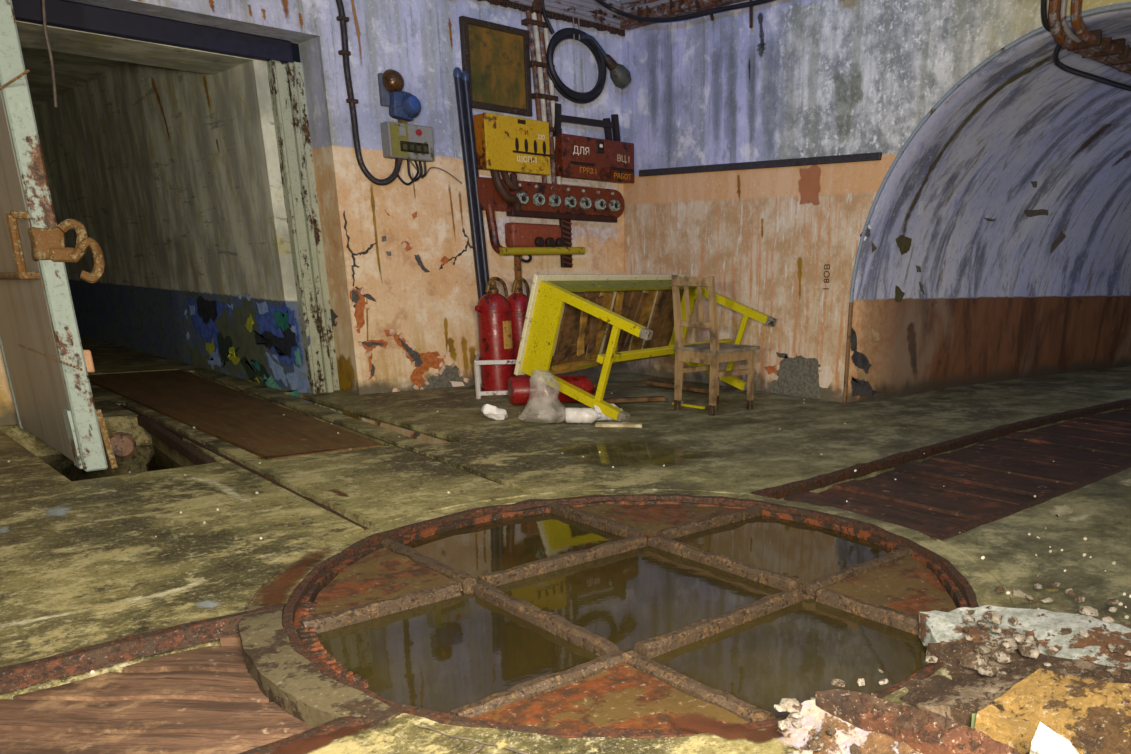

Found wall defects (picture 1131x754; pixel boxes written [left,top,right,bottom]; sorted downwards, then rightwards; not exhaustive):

leakage [748,13,765,79]
crack [343,210,377,308]
crack [439,228,473,270]
peeling [347,285,474,394]
flaking render [765,352,833,399]
flaking render [850,328,877,399]